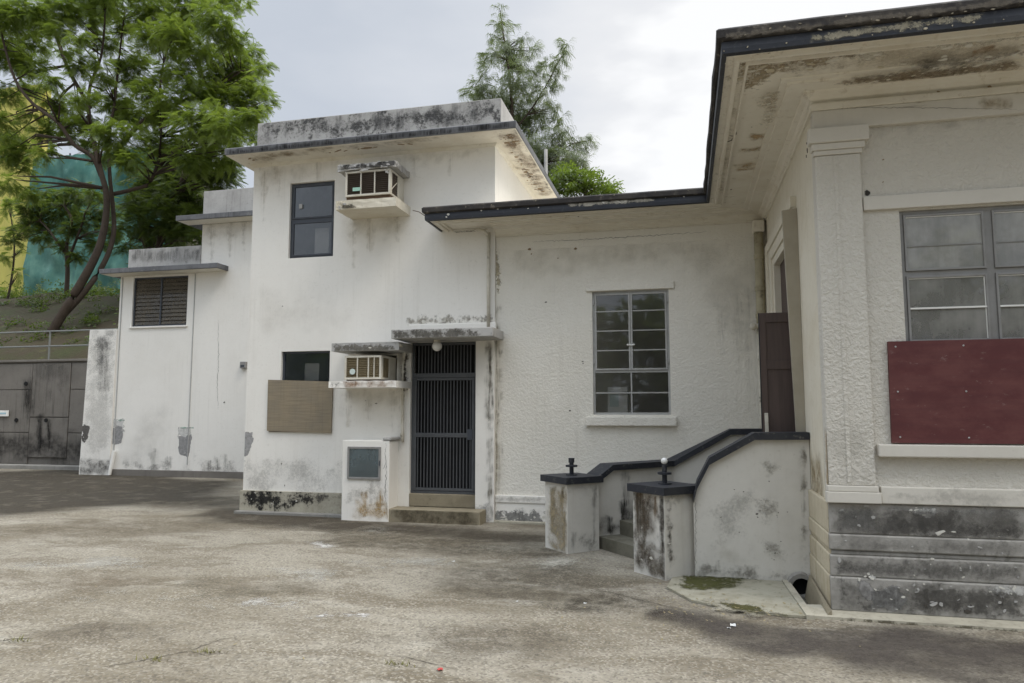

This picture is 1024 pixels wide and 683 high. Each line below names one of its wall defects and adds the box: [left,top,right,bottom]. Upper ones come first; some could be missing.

damp [229,103,509,154]
spalling [81,425,90,443]
damp [0,415,567,556]
mould [599,493,673,577]